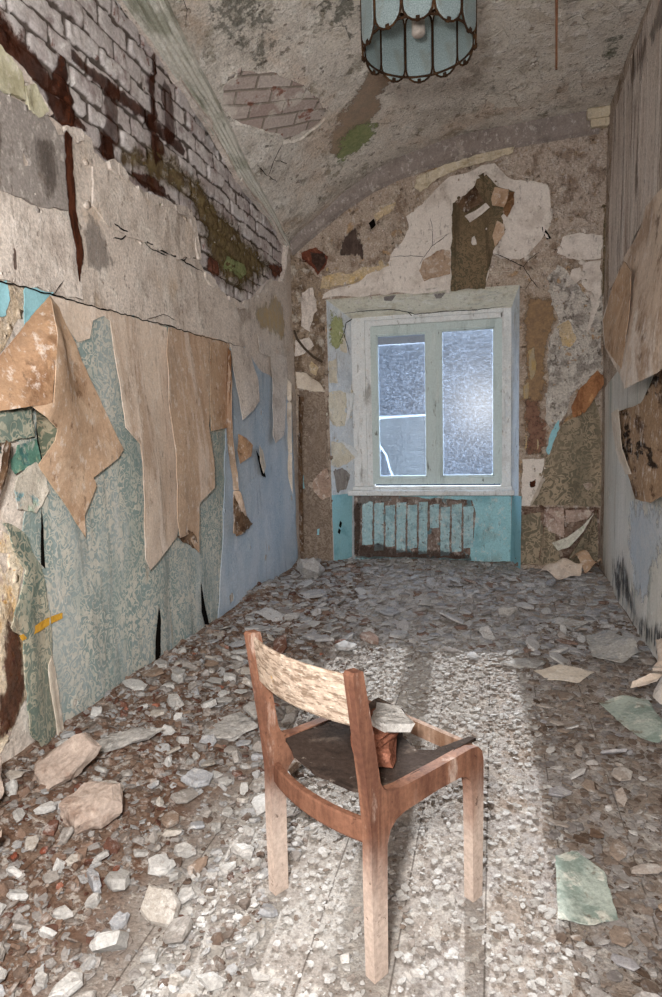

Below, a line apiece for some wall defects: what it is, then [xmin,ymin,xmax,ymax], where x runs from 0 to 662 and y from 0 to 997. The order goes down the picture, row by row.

rust [0,7,185,282]
damp [98,131,115,161]
damp [131,170,170,199]
damp [206,256,246,279]
damp [268,264,282,278]
flaking render [0,0,626,568]
rust [353,496,476,561]
peeling [0,529,27,753]
peeling [122,679,148,691]
peeling [217,689,257,720]
peeling [199,734,217,746]
peeling [171,787,198,804]